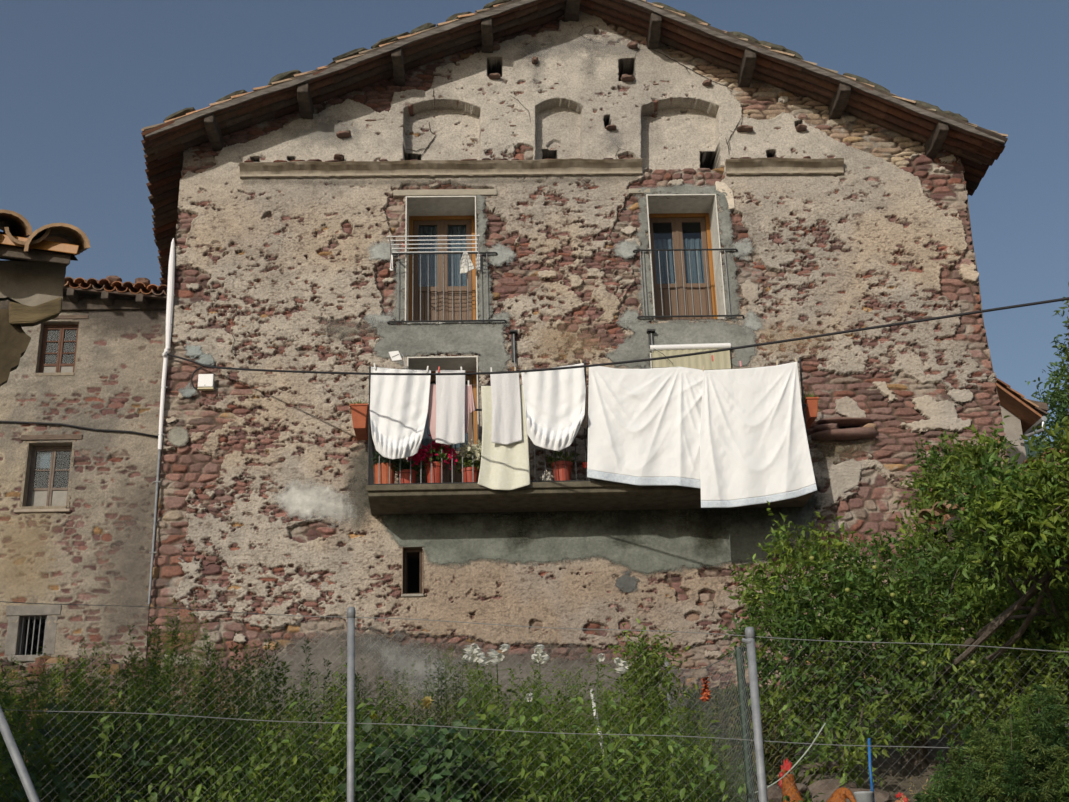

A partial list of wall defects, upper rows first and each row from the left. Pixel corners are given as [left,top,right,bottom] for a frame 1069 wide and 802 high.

spalling [313,15,564,114]
spalling [182,111,301,178]
spalling [514,145,533,160]
spalling [176,211,198,247]
spalling [173,268,211,308]
spalling [482,199,565,301]
spalling [571,279,595,303]
spalling [603,20,1007,593]
spalling [163,343,253,434]
spalling [146,446,794,680]